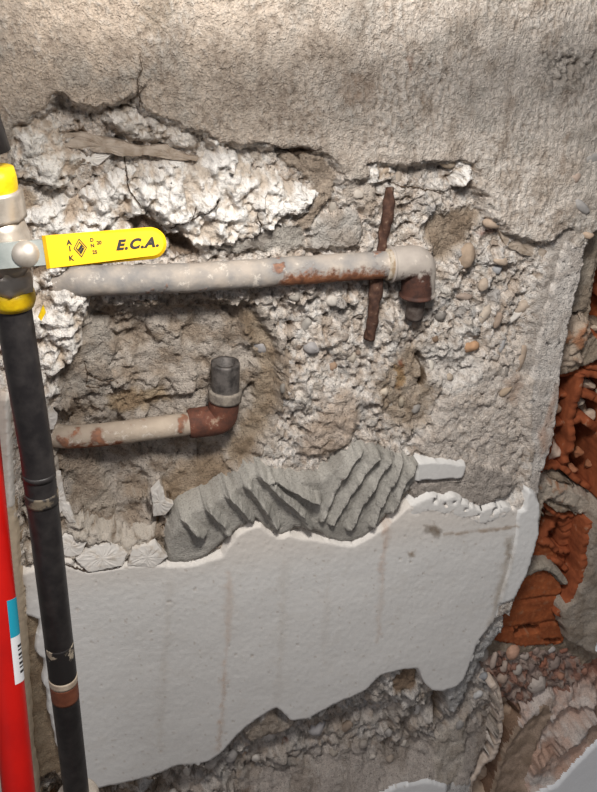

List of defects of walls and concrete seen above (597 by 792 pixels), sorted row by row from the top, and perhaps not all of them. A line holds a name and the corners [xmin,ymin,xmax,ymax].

crack [137,56,145,107]
hole [532,41,597,93]
corrosion [377,187,395,251]
spalling [7,91,560,572]
corrosion [363,279,383,342]
flaking render [0,346,9,393]
flaking render [27,616,62,792]
spalling [99,615,504,792]
spalling [517,658,597,792]